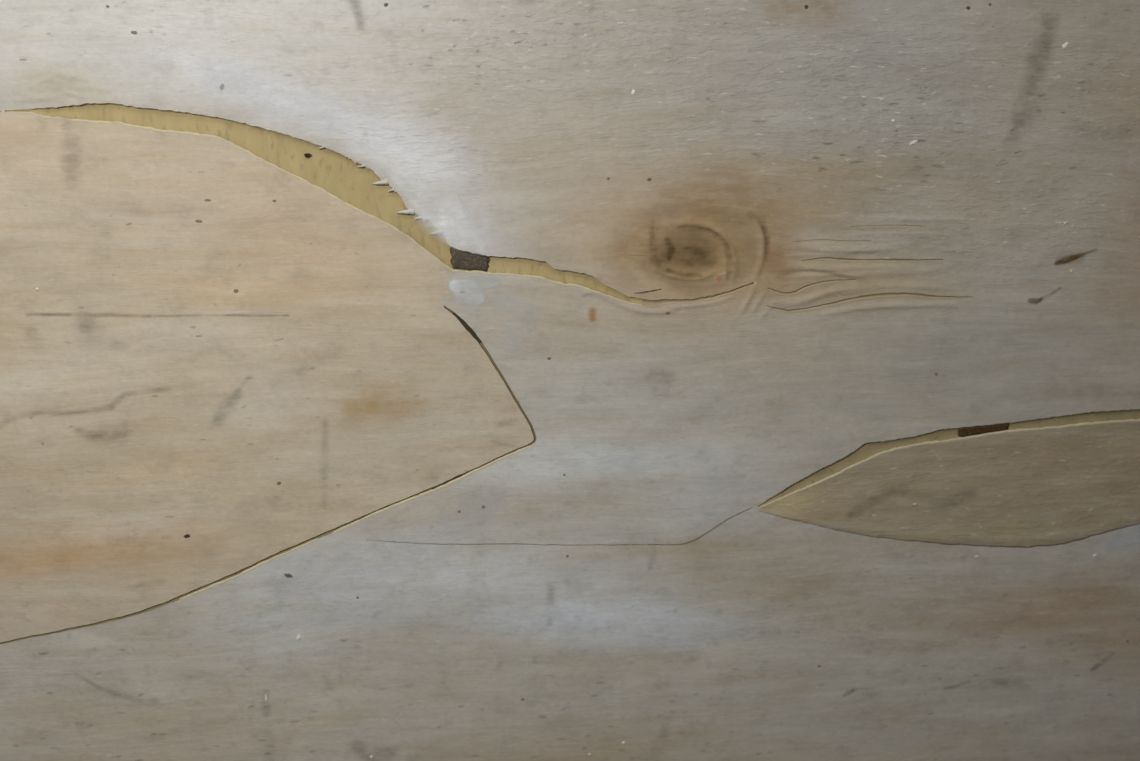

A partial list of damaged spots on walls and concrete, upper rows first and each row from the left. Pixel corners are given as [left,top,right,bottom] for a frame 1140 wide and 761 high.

crack [0,103,753,308]
crack [0,306,536,644]
crack [513,507,752,546]
peeling [758,409,1140,548]